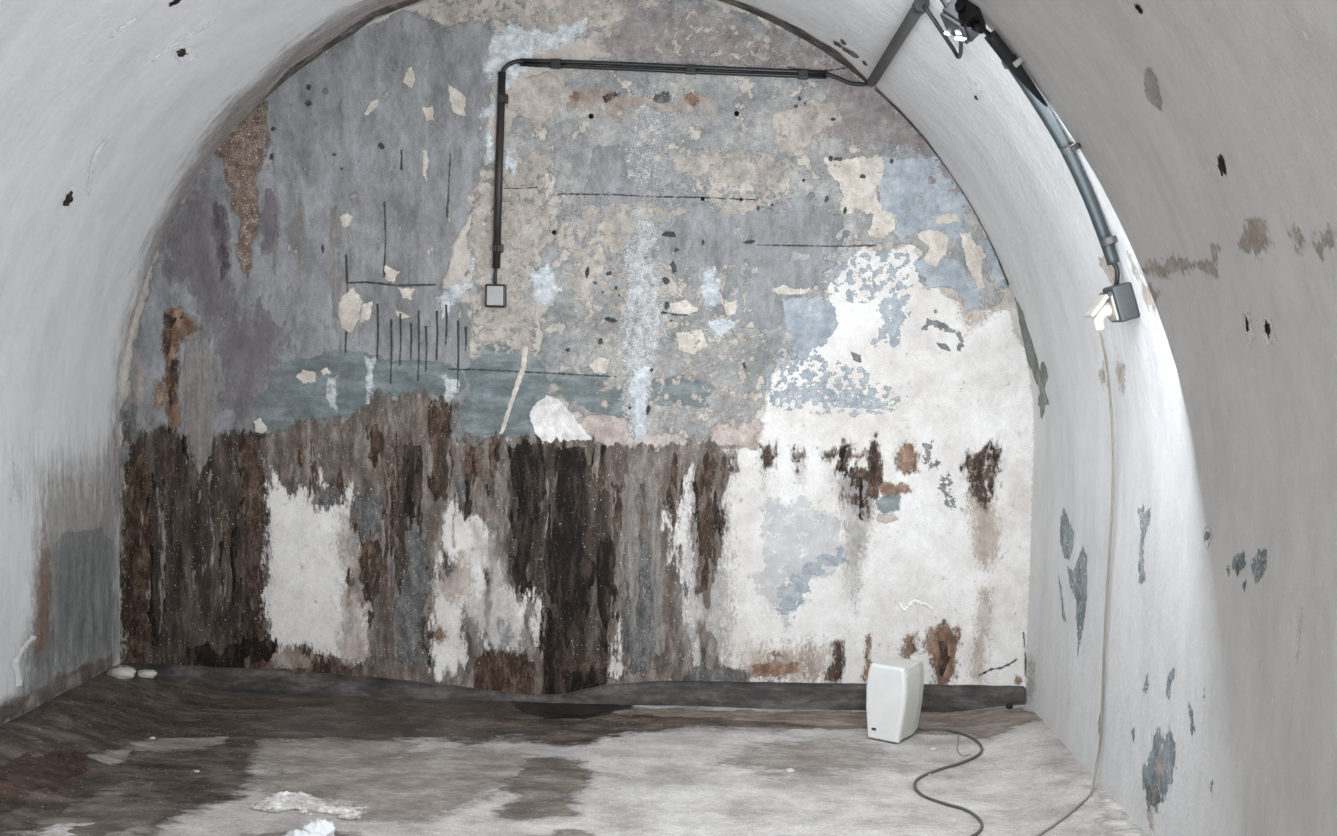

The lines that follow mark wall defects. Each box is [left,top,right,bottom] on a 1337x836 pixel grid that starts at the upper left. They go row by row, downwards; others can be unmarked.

flaking render [1144,69,1162,110]
peeling [119,0,1049,687]
damp [0,0,961,836]
damp [960,439,1003,570]
peeling [1058,508,1087,656]
peeling [1138,505,1150,583]
peeling [1226,549,1267,591]
damp [970,589,991,679]
peeling [1142,726,1177,813]